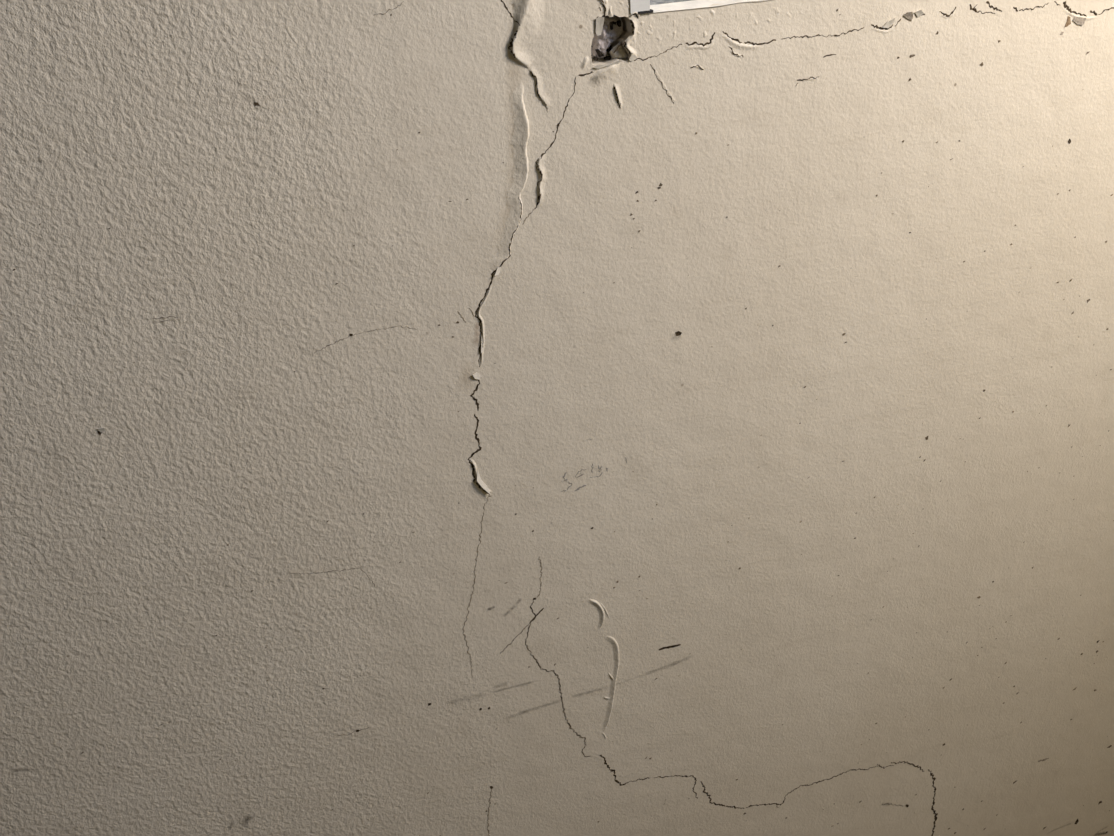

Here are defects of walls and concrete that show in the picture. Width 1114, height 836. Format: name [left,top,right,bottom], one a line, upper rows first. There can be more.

spalling [579,7,640,109]
crack [599,0,630,17]
crack [634,1,1114,85]
crack [457,77,576,675]
crack [525,557,938,836]
crack [486,786,494,836]